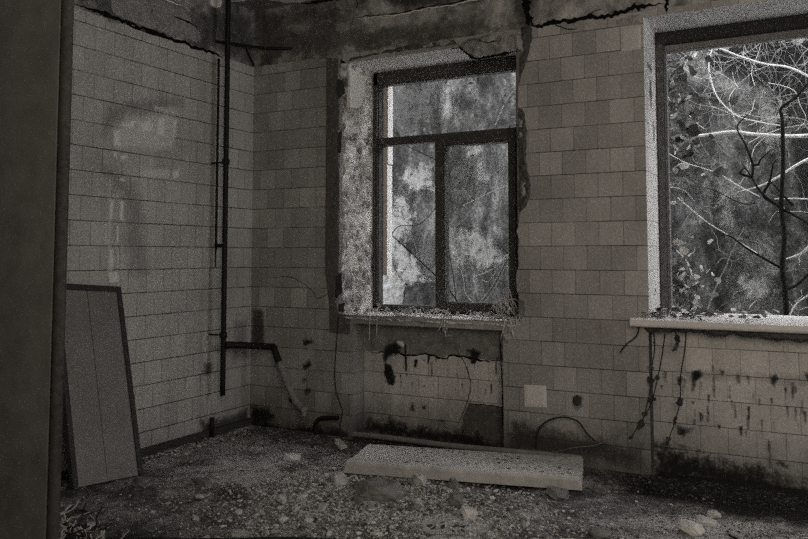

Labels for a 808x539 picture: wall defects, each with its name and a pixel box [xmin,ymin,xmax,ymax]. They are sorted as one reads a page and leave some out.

flaking render [111,0,201,43]
crack [297,0,477,19]
crack [521,0,669,30]
flaking render [325,39,457,335]
peeling [365,325,503,383]
leakage [365,416,498,447]
peeling [462,403,504,448]
leakage [654,443,807,492]